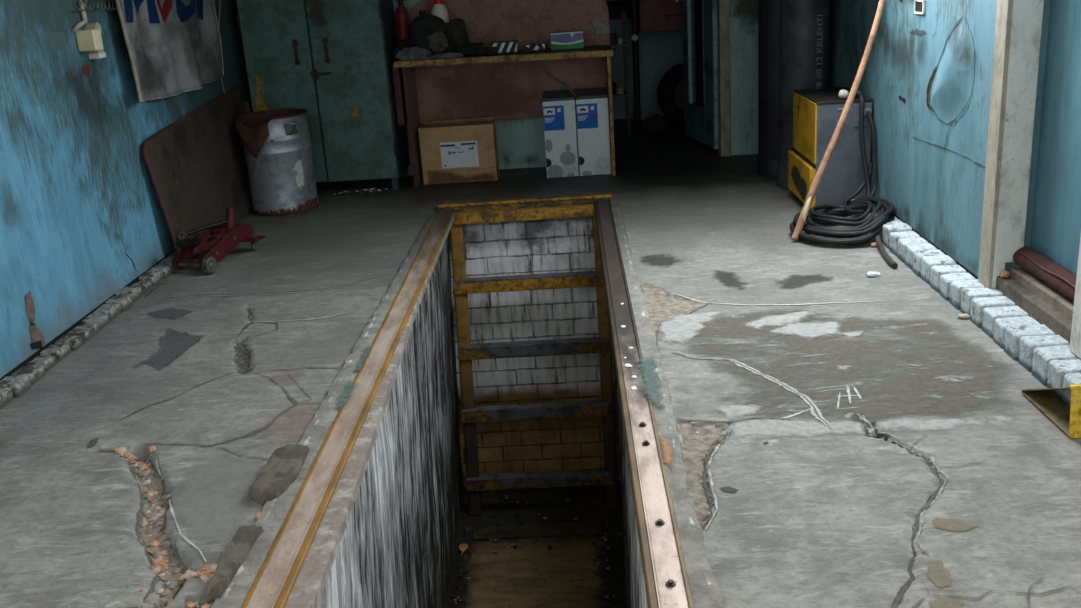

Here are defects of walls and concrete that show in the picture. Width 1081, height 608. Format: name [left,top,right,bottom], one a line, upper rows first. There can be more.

crack [909,1,986,168]
spalling [134,308,202,370]
spalling [641,281,720,351]
crack [87,253,389,608]
spalling [675,405,1012,525]
crack [672,351,1081,608]